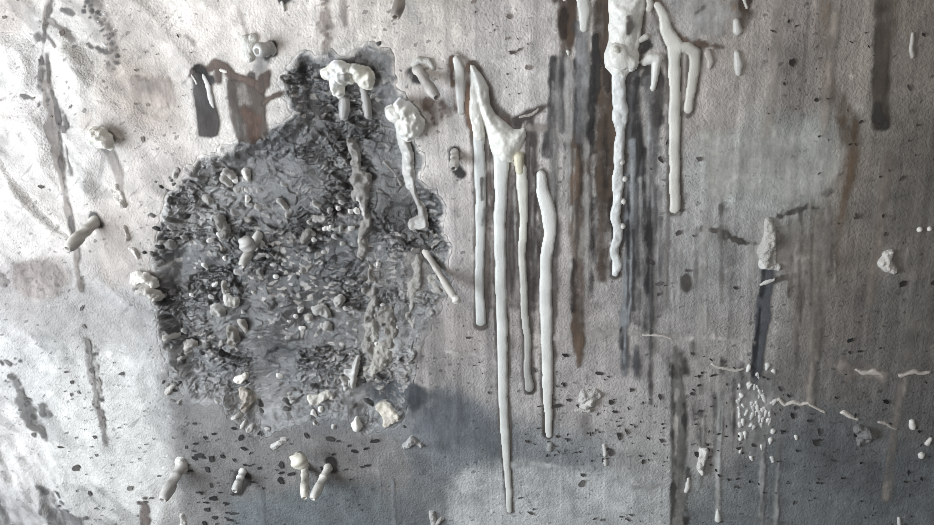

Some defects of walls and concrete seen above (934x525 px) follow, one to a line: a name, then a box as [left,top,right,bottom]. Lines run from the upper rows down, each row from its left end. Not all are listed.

spalling [142,0,455,525]
water stain [507,0,596,304]
water stain [609,71,678,404]
water stain [680,196,728,292]
water stain [742,256,774,384]
water stain [786,201,835,405]
water stain [871,0,890,131]